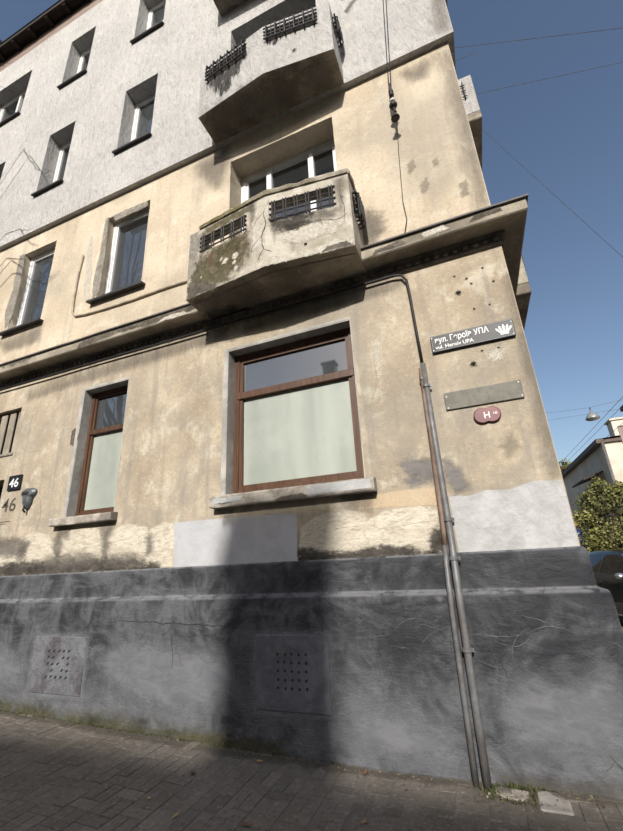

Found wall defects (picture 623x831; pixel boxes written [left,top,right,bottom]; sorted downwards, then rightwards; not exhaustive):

water stain [204,52,292,137]
spalling [250,204,270,249]
crack [251,209,270,260]
spalling [219,220,354,280]
water stain [401,459,434,486]